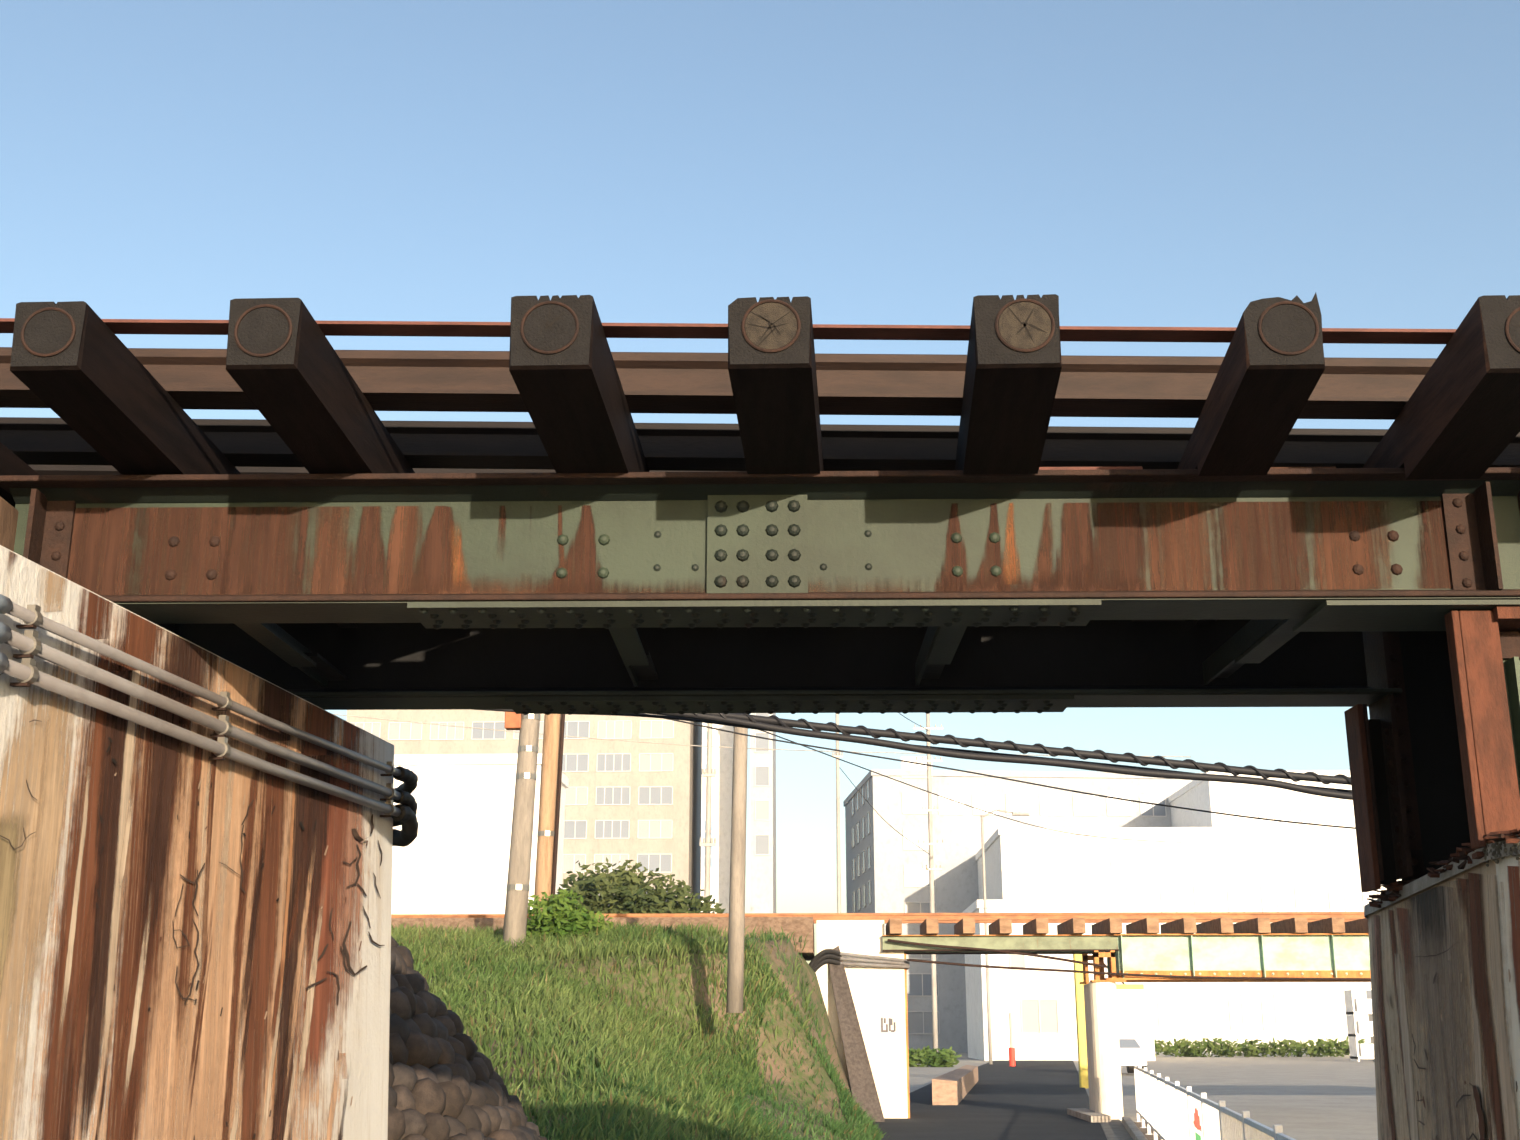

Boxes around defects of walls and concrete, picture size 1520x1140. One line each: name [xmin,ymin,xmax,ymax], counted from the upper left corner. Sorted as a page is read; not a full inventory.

crack [0,780,37,850]
corrosion [42,505,707,1140]
corrosion [1366,829,1520,1140]